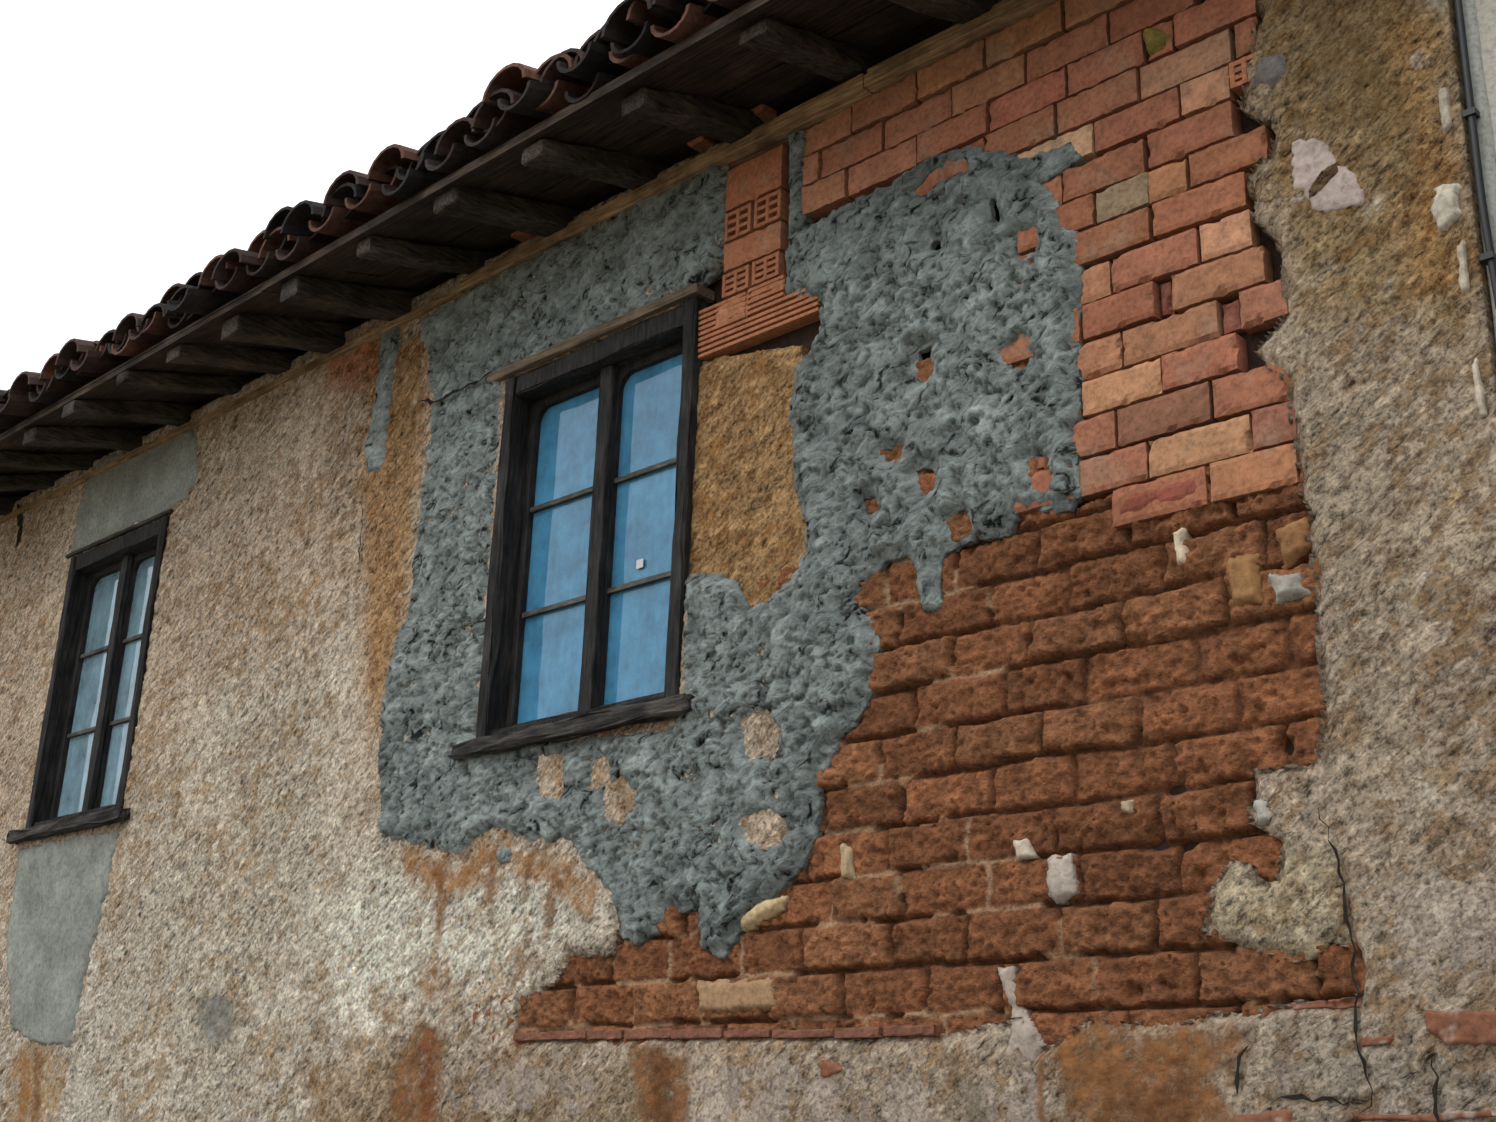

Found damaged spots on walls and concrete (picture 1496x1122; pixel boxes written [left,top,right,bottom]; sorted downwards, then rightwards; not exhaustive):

flaking render [698,0,1365,529]
crack [1234,807,1373,1122]
rust [392,1025,443,1122]
rust [632,1045,689,1122]
rust [1038,1018,1238,1122]
crack [1431,1054,1440,1122]